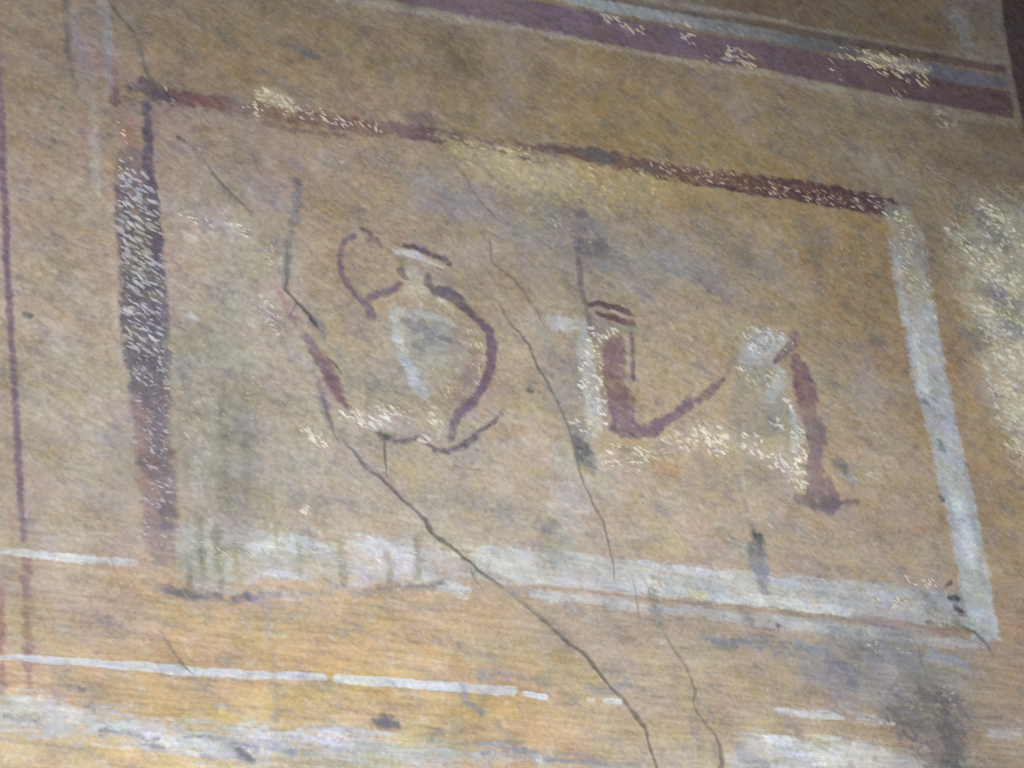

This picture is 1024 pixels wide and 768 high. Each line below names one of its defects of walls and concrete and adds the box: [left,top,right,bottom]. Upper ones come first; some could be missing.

flaking render [115,157,165,379]
crack [283,247,323,333]
crack [321,396,658,767]
crack [454,159,724,768]